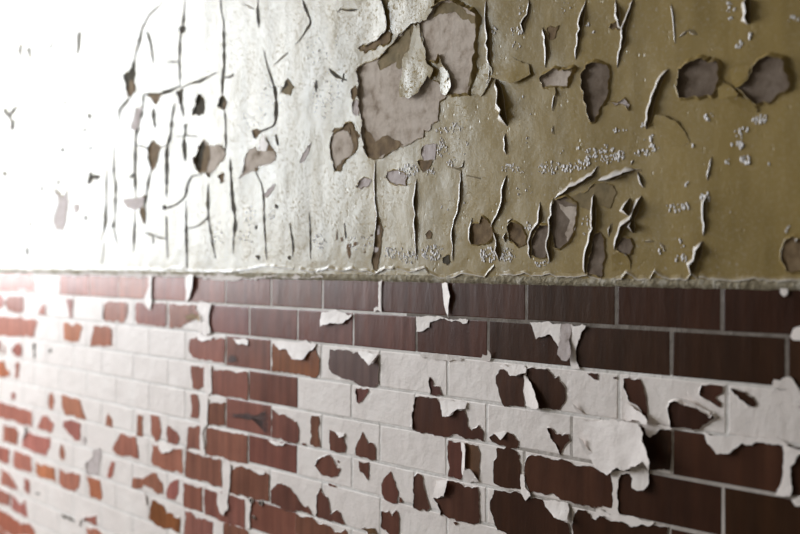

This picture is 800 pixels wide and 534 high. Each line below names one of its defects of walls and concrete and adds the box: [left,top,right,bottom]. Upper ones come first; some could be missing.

crack [243,0,260,27]
crack [260,0,312,145]
crack [314,68,347,92]
peeling [329,0,493,172]
crack [100,0,237,272]
peeling [192,140,226,184]
crack [255,171,267,260]
crack [289,212,312,259]
peeling [530,321,598,380]
peeling [0,271,380,534]
peeling [411,364,800,534]
peeling [361,471,403,534]